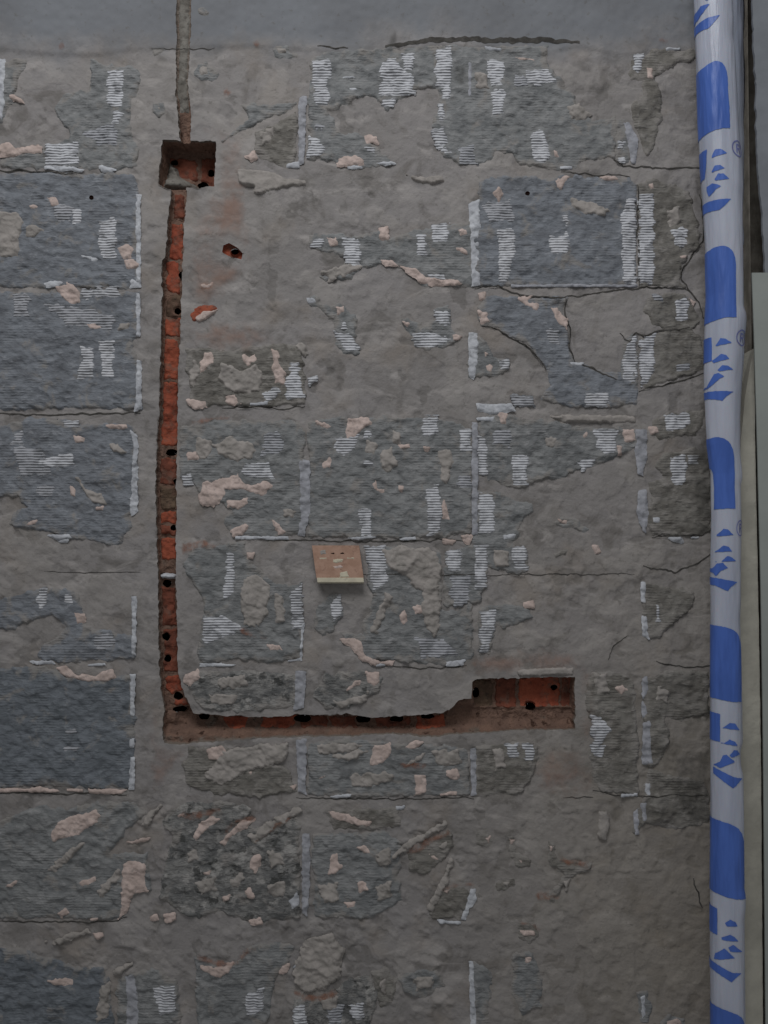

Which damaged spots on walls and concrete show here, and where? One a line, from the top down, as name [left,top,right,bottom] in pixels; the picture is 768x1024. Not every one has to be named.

crack [385,36,580,47]
spalling [0,58,143,545]
spalling [166,44,711,723]
crack [474,159,704,379]
crack [440,531,710,576]
spalling [0,587,540,1024]
spalling [585,670,710,835]